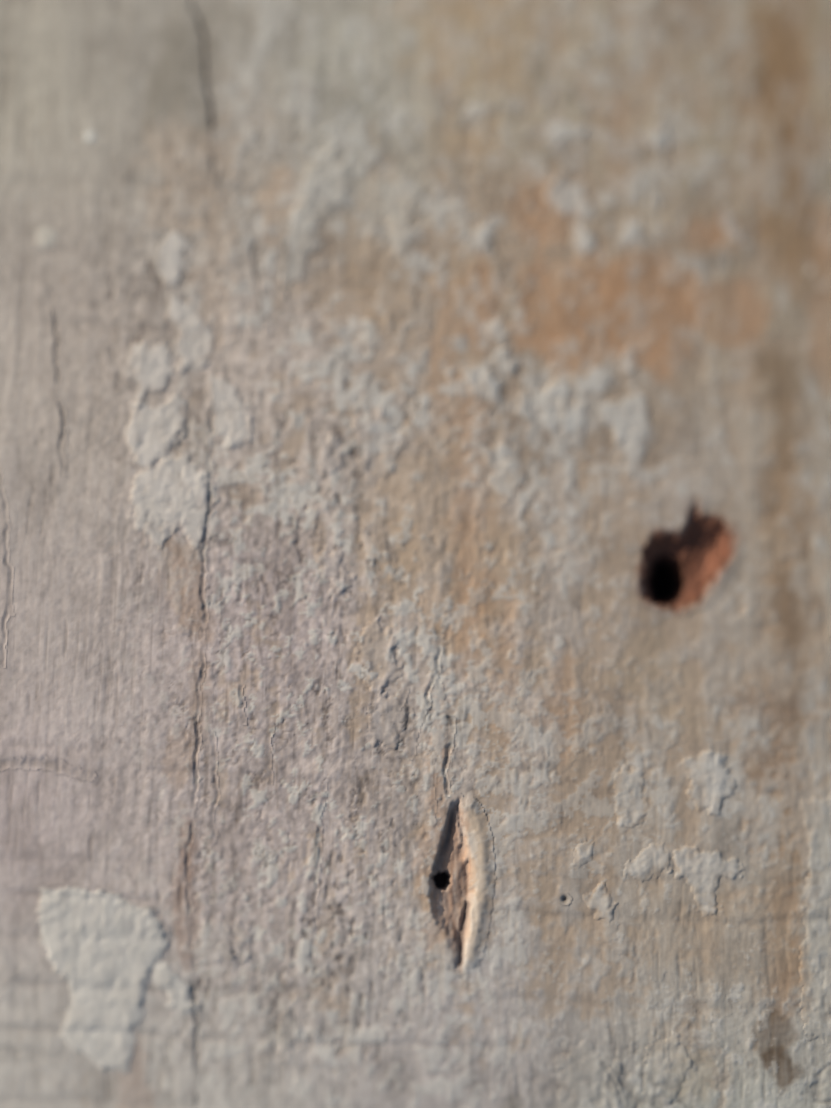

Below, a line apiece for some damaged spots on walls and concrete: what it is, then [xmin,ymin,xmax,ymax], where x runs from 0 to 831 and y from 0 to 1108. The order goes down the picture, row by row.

crack [189,0,291,331]
peeling [122,229,254,554]
peeling [36,885,200,1074]